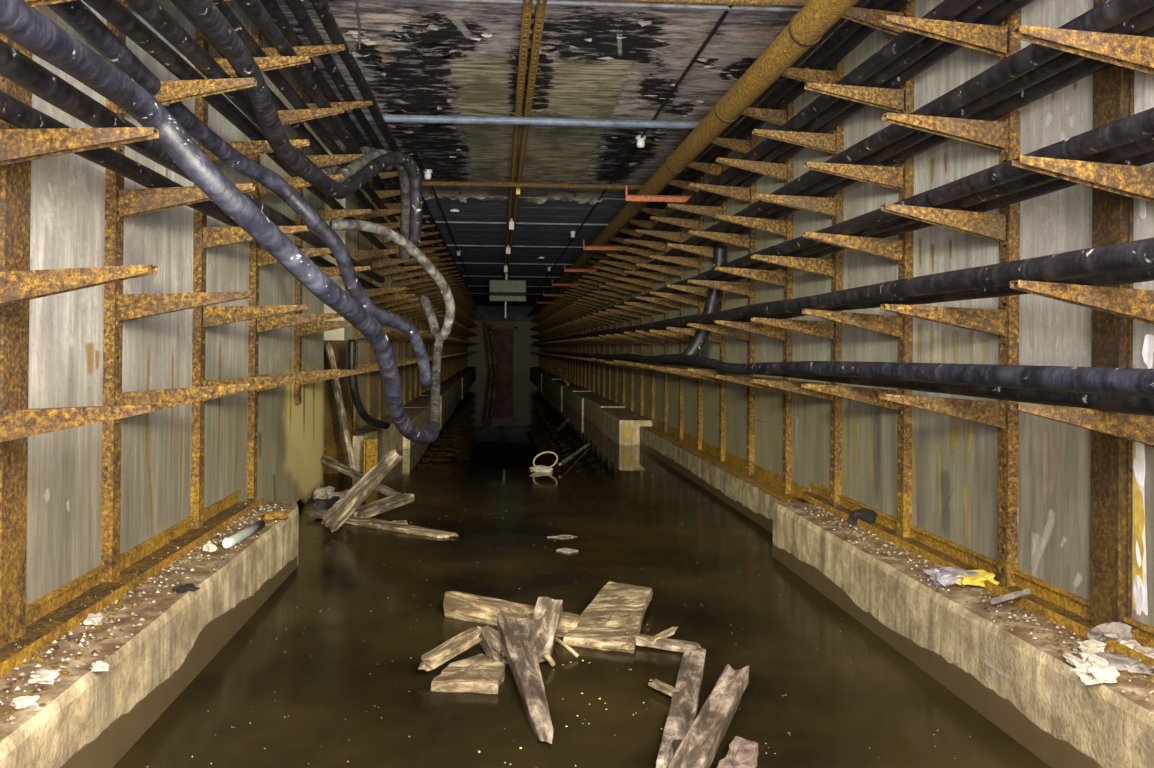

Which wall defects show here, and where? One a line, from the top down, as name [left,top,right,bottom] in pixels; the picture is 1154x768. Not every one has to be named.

rust [87,344,99,372]
rust [919,326,957,364]
peeling [1142,334,1154,369]
rust [284,361,324,499]
peeling [1133,441,1148,616]